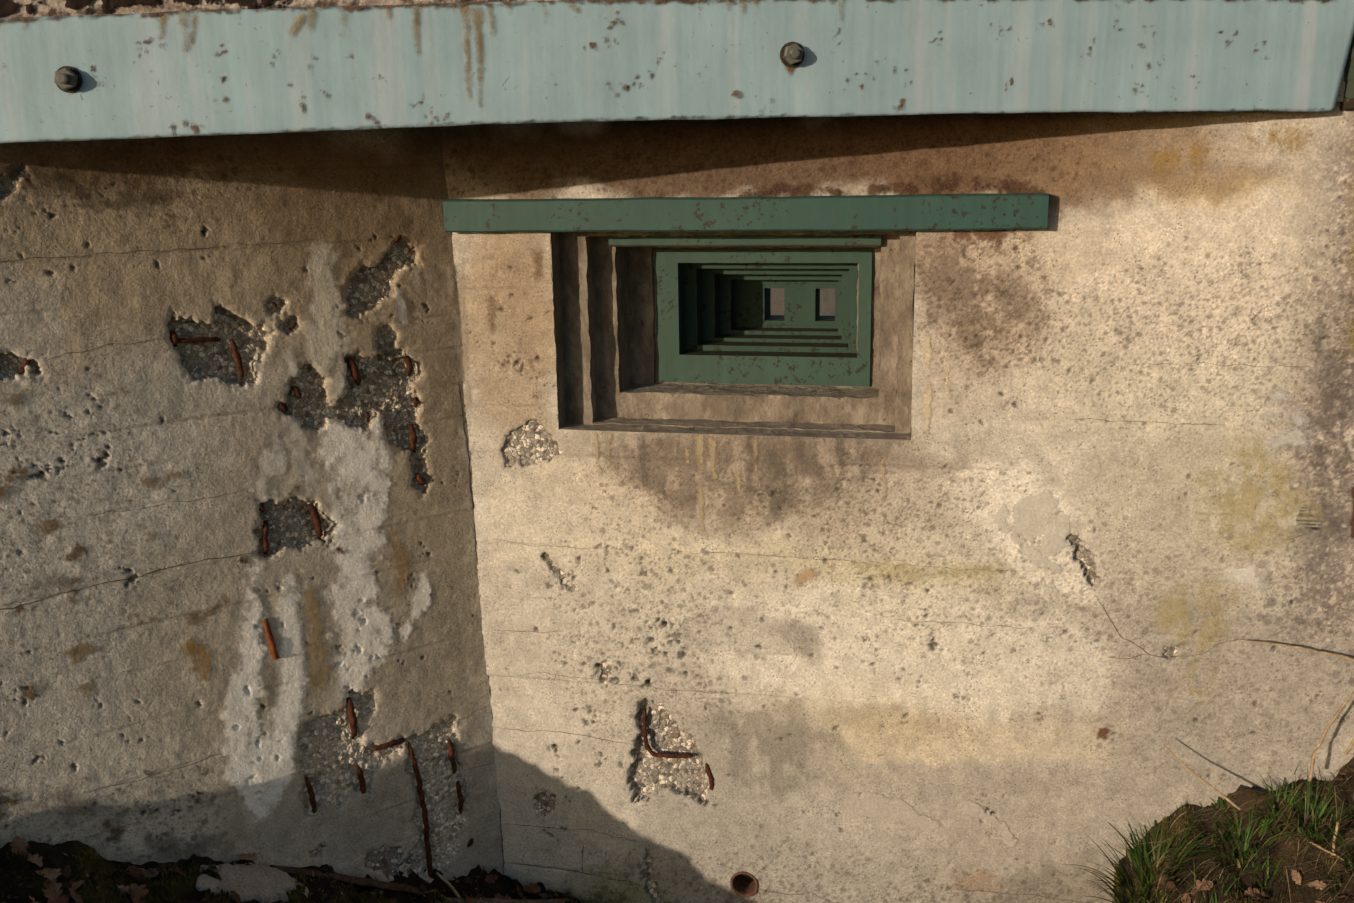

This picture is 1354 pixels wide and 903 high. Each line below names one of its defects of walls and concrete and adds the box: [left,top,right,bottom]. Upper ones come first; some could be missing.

corrosion [0,13,125,22]
corrosion [137,0,759,79]
spalling [167,296,302,386]
damp [285,241,351,404]
damp [395,290,409,325]
spalling [278,324,432,493]
spalling [253,499,336,557]
damp [257,414,431,701]
damp [674,434,717,531]
damp [219,562,306,822]
spalling [297,689,474,879]
spalling [627,698,714,805]